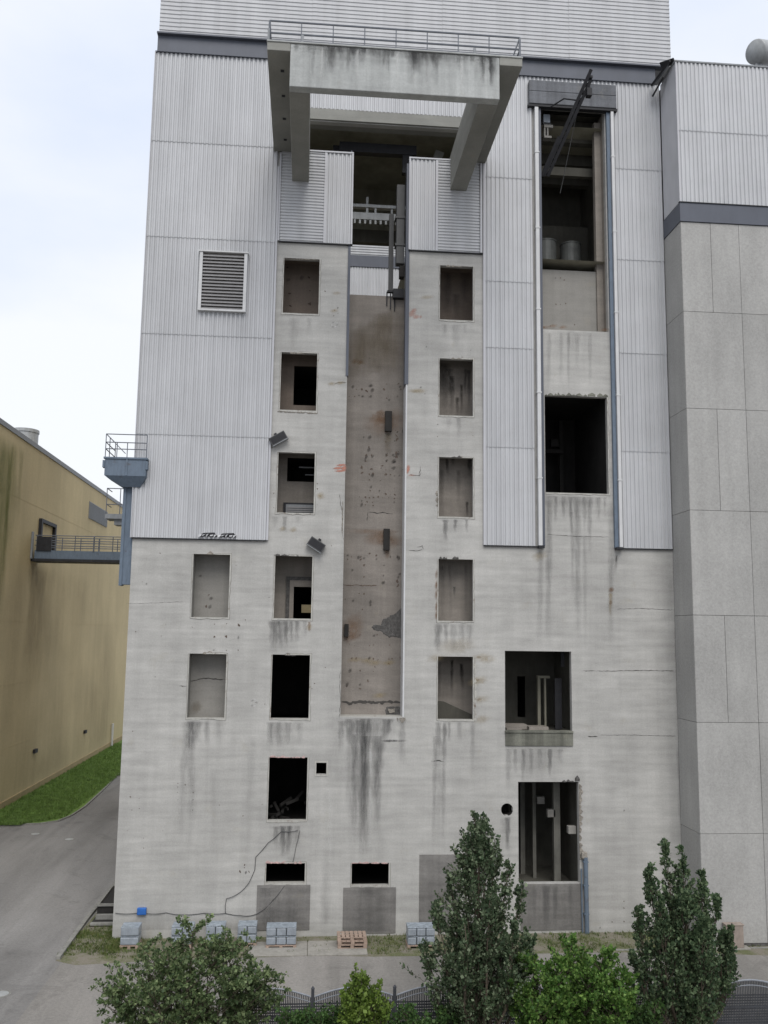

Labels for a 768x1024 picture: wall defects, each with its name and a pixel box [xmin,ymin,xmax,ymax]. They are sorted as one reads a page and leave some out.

spalling [346,609,401,689]
spalling [385,706,405,723]